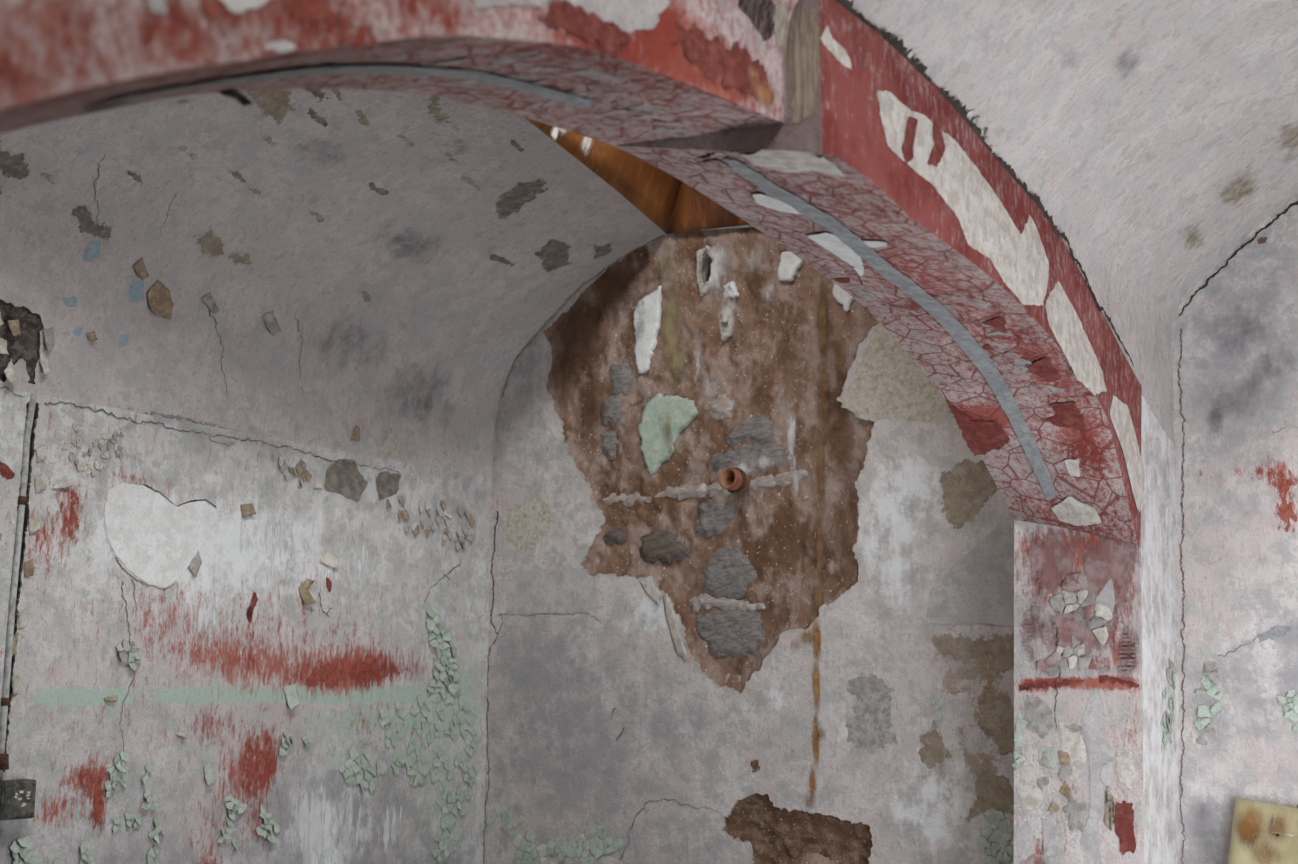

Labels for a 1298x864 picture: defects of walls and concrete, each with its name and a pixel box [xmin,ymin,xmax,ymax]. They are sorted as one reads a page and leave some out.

peeling [474,0,669,34]
crack [835,0,1134,367]
spalling [0,299,55,384]
peeling [0,403,126,754]
crack [0,386,400,473]
crack [425,511,600,864]
spalling [542,227,951,694]
rust [802,622,823,803]
peeling [931,632,1014,674]
crack [1053,626,1061,728]
crack [1177,201,1298,864]
spalling [722,793,873,864]